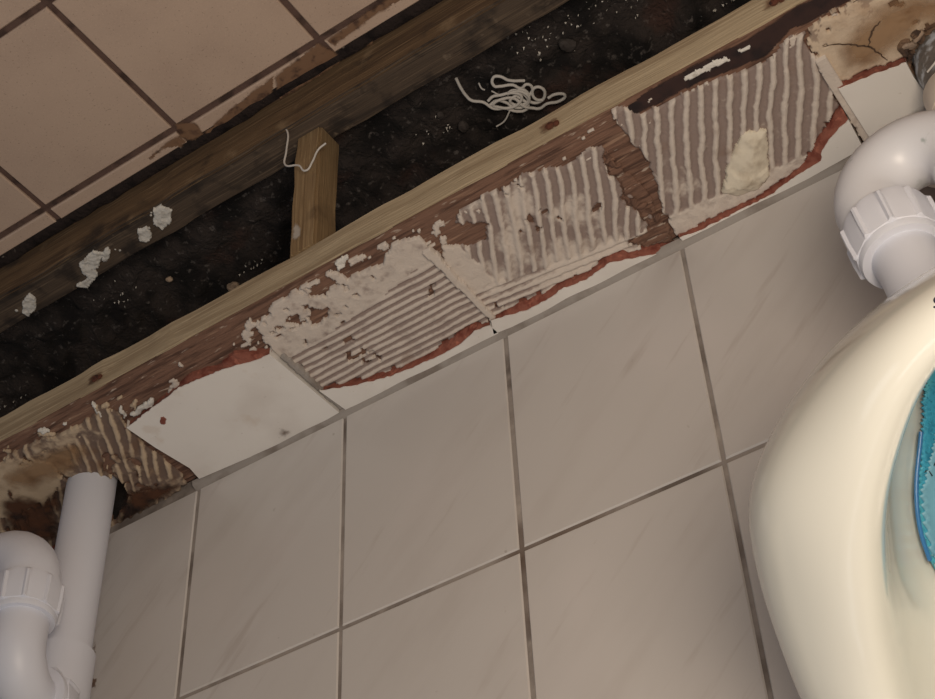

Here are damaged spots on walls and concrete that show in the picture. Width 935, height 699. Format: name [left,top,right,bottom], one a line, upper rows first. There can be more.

crack [824,21,887,60]
leakage [847,0,935,62]
spalling [91,30,926,479]
peeling [37,427,56,437]
leakage [4,446,78,540]
spalling [112,480,129,520]